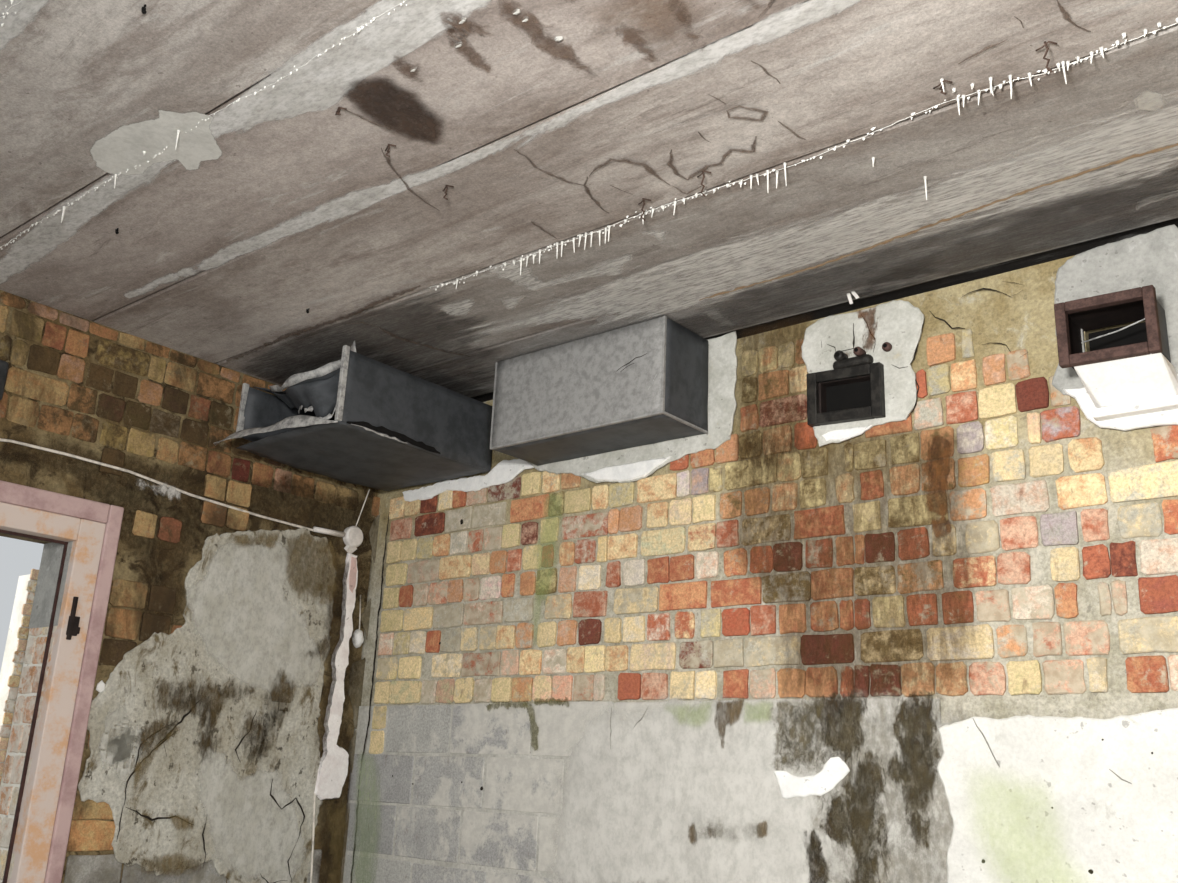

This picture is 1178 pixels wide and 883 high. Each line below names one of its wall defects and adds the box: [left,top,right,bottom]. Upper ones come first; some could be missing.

water stain [0,0,407,250]
crack [346,110,440,211]
crack [513,94,806,213]
water stain [244,18,1178,398]
water stain [5,439,371,883]
water stain [776,692,940,883]